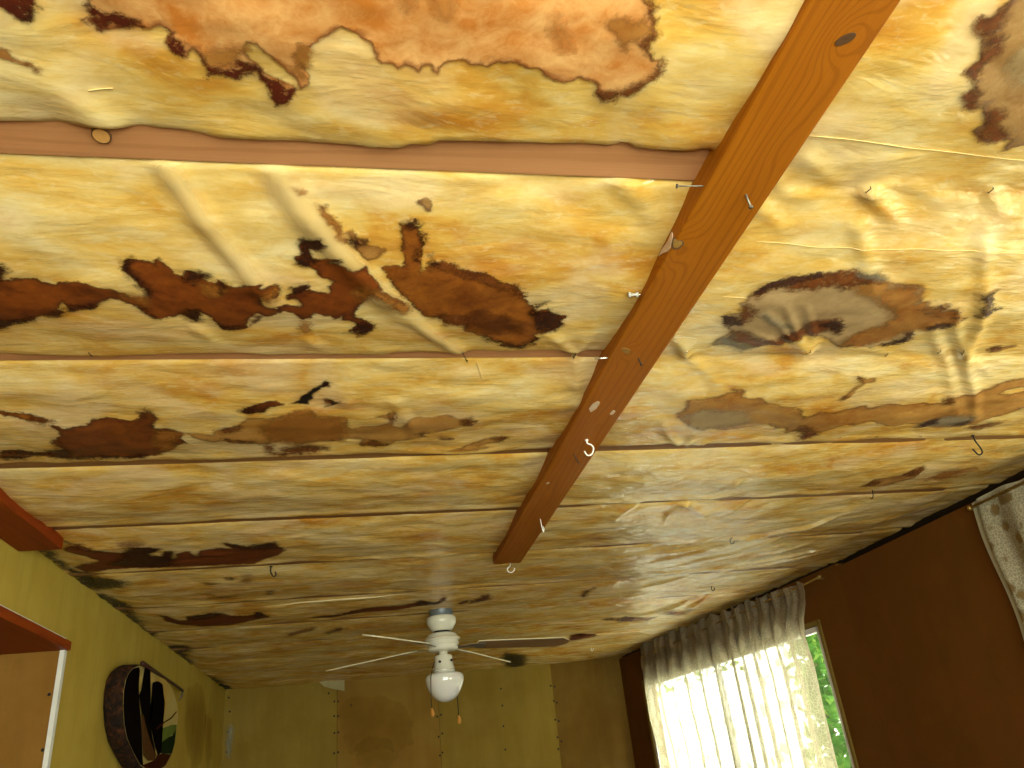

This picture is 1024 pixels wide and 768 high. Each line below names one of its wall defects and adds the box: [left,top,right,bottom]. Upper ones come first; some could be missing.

damp [81,0,668,107]
damp [962,0,1024,151]
damp [0,205,566,349]
damp [713,269,1003,350]
damp [0,381,508,461]
damp [678,376,1024,441]
damp [38,541,286,636]
mould [168,646,193,665]